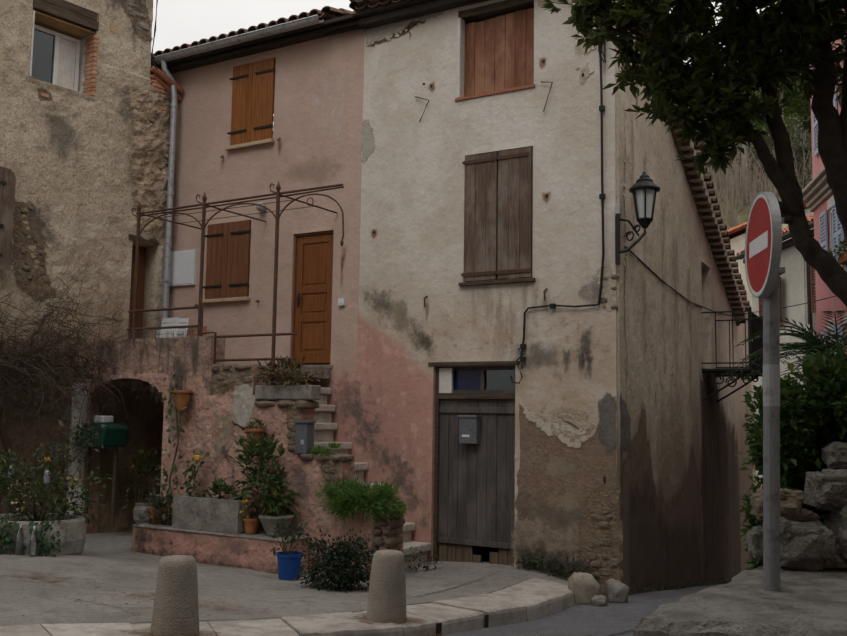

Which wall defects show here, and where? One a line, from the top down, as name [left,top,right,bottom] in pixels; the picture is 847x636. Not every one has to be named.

damp [579,332,591,370]
peeling [511,404,623,595]